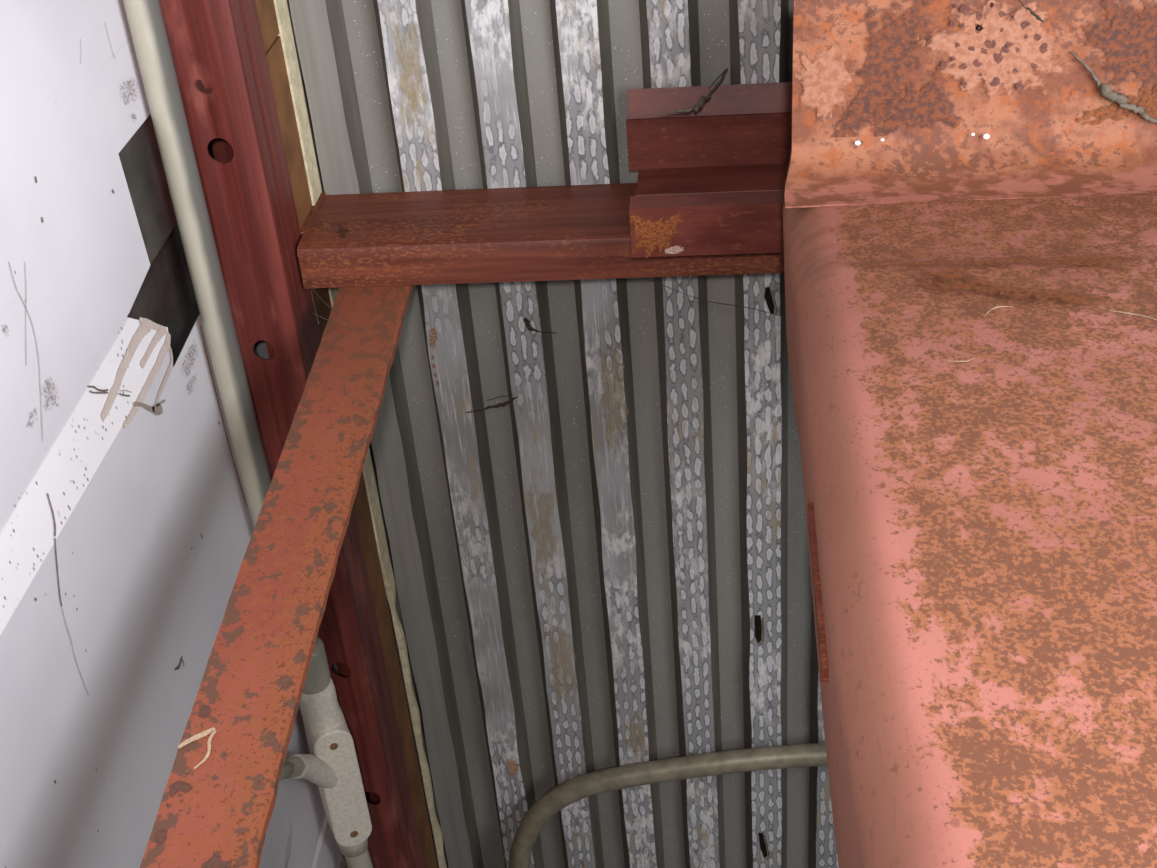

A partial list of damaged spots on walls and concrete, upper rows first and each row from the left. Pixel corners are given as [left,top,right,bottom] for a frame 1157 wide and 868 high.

corrosion [831,0,965,138]
corrosion [1071,0,1157,125]
corrosion [630,210,684,258]
corrosion [200,326,247,507]